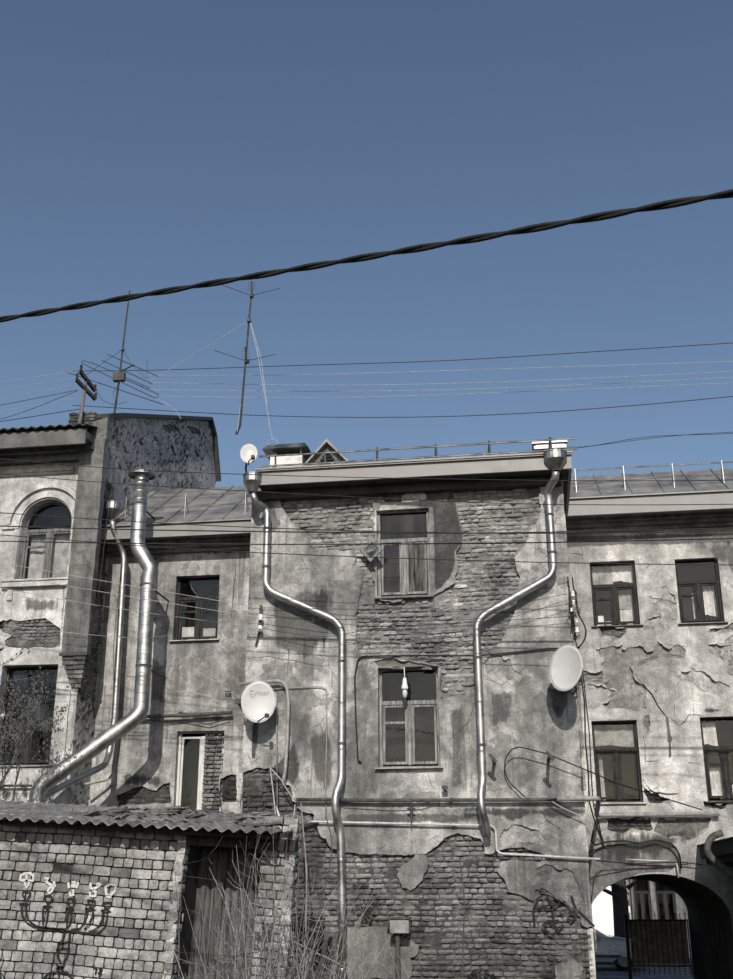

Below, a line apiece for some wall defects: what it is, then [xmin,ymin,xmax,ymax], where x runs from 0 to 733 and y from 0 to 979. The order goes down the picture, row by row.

spalling [0,618,61,651]
flaking render [280,487,544,699]
flaking render [580,586,733,735]
spalling [116,783,171,807]
flaking render [219,768,726,979]